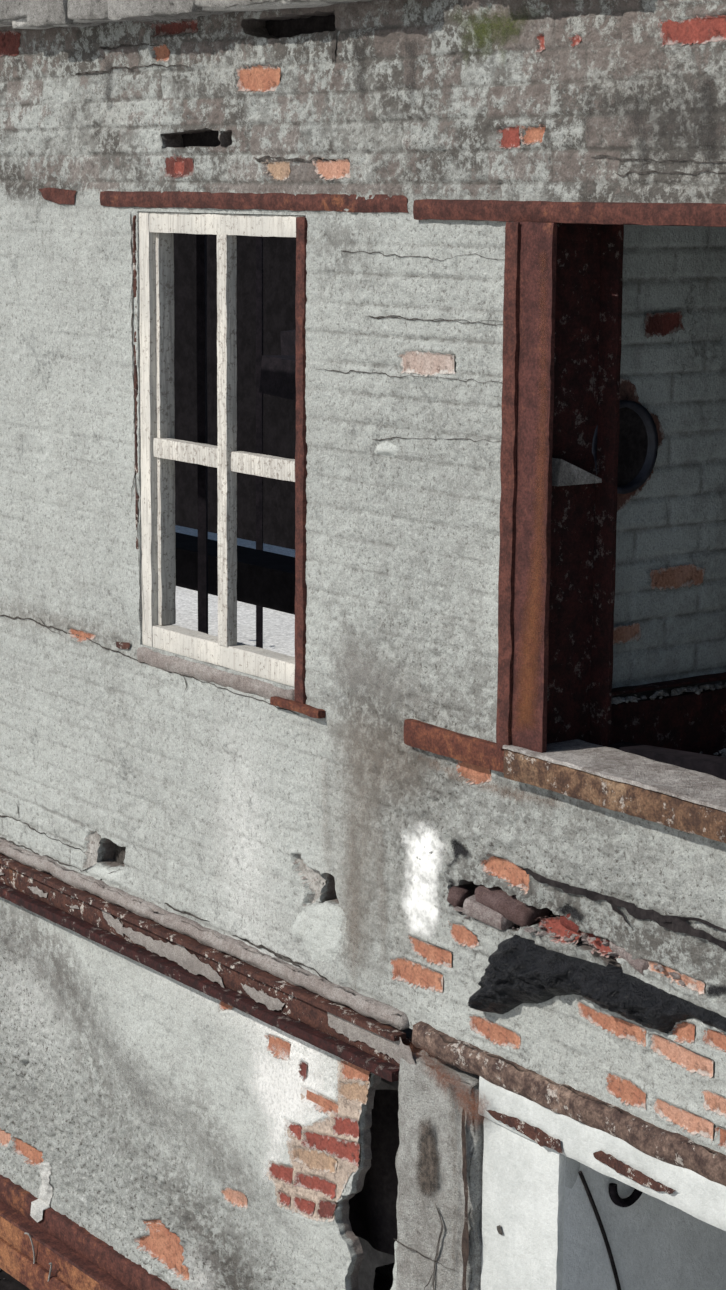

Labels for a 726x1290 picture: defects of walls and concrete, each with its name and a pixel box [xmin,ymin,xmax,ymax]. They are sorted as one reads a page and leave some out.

spalling [265,14,336,38]
flaking render [163,130,221,179]
flaking render [101,909,233,1011]
flaking render [240,983,284,1011]
damp [403,826,443,936]
spalling [390,854,705,995]
flaking render [134,1219,189,1281]
spalling [264,1034,371,1222]
crack [393,1110,469,1290]
rust [417,1050,485,1120]
spalling [327,1002,726,1196]
spalling [593,1151,676,1194]